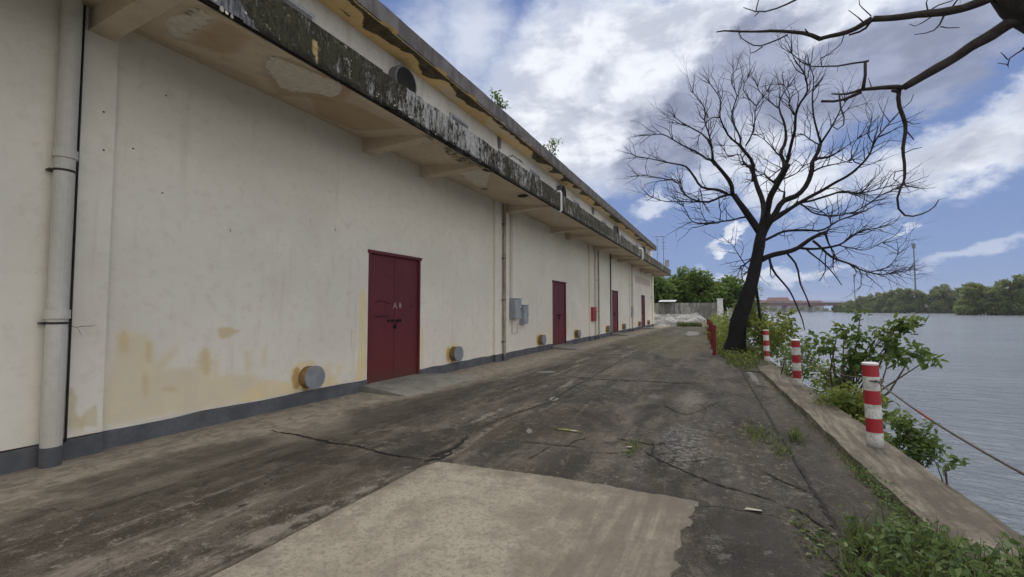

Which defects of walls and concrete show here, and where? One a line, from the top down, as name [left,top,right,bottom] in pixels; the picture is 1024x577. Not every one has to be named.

peeling [261,55,354,98]
peeling [374,83,505,190]
water stain [334,0,656,251]
water stain [63,316,287,438]
water stain [313,283,367,387]
crack [424,435,468,461]